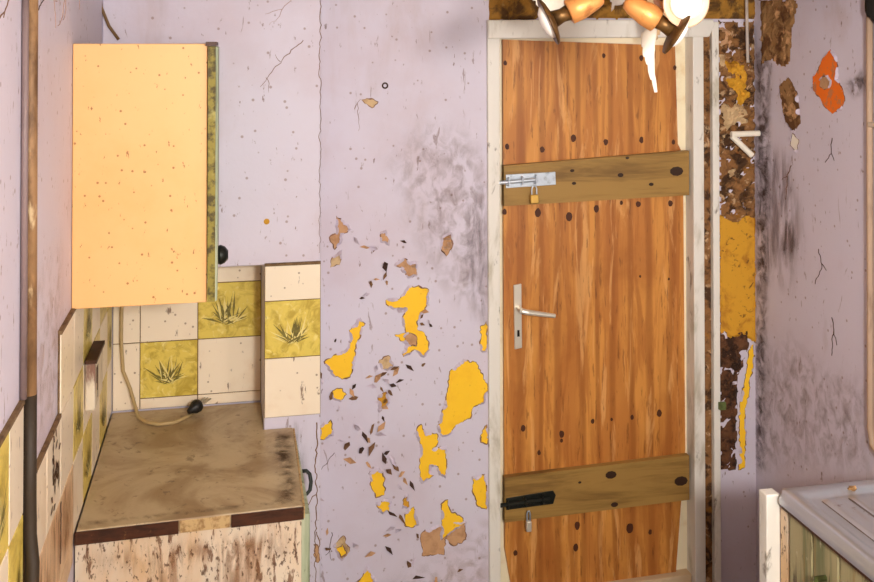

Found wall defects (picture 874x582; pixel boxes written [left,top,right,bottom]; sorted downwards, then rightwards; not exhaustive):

crack [38,0,80,28]
peeling [812,49,845,114]
leakage [757,104,768,231]
peeling [329,216,390,267]
peeling [439,232,454,256]
spalling [718,0,801,471]
peeling [313,258,488,582]